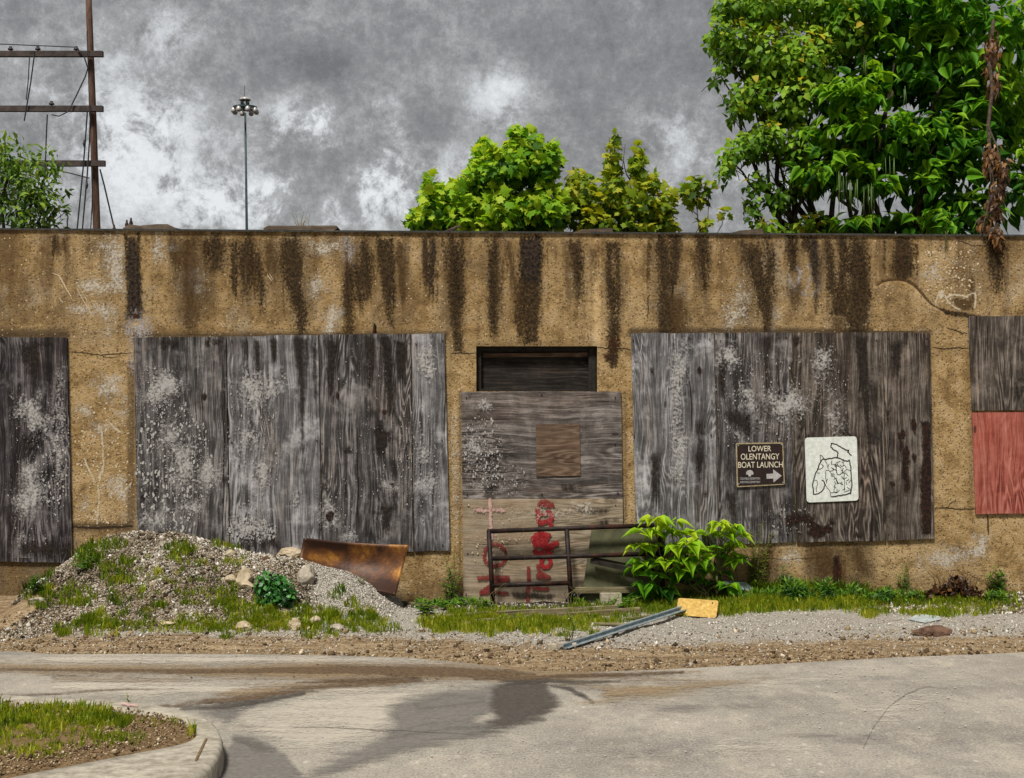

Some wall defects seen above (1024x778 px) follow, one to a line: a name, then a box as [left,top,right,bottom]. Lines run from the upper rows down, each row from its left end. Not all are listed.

leakage [123,233,142,319]
leakage [169,232,407,453]
leakage [422,234,468,352]
leakage [484,234,548,345]
leakage [566,240,623,368]
leakage [646,234,712,333]
leakage [717,358,726,397]
leakage [725,232,918,471]